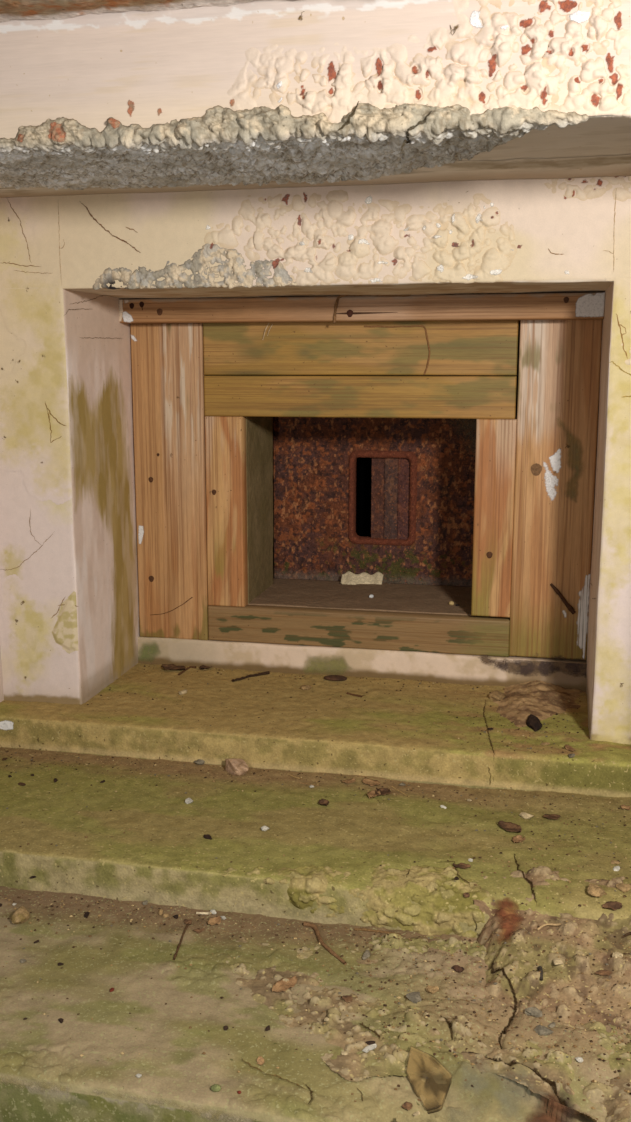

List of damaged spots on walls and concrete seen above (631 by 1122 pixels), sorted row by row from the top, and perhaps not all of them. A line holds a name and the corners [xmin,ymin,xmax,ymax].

rust [0,0,183,23]
spalling [0,99,590,190]
crack [337,101,359,131]
crack [401,111,432,151]
crack [3,201,44,274]
crack [81,203,139,252]
spalling [93,243,313,290]
crack [514,854,537,904]
spalling [176,864,490,965]
spalling [226,937,631,1122]
crack [441,958,567,1106]